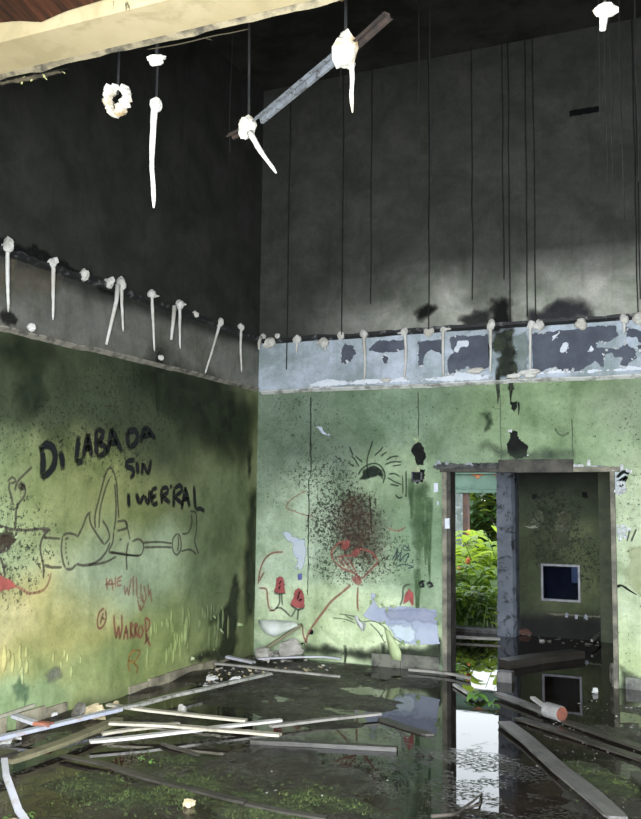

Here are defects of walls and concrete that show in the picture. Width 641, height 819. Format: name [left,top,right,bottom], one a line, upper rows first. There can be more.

peeling [340,344,356,365]
peeling [369,340,404,364]
peeling [417,334,492,382]
peeling [532,325,641,376]
spalling [309,377,410,388]
damp [0,528,19,557]
damp [190,493,256,662]
peeling [354,593,440,661]